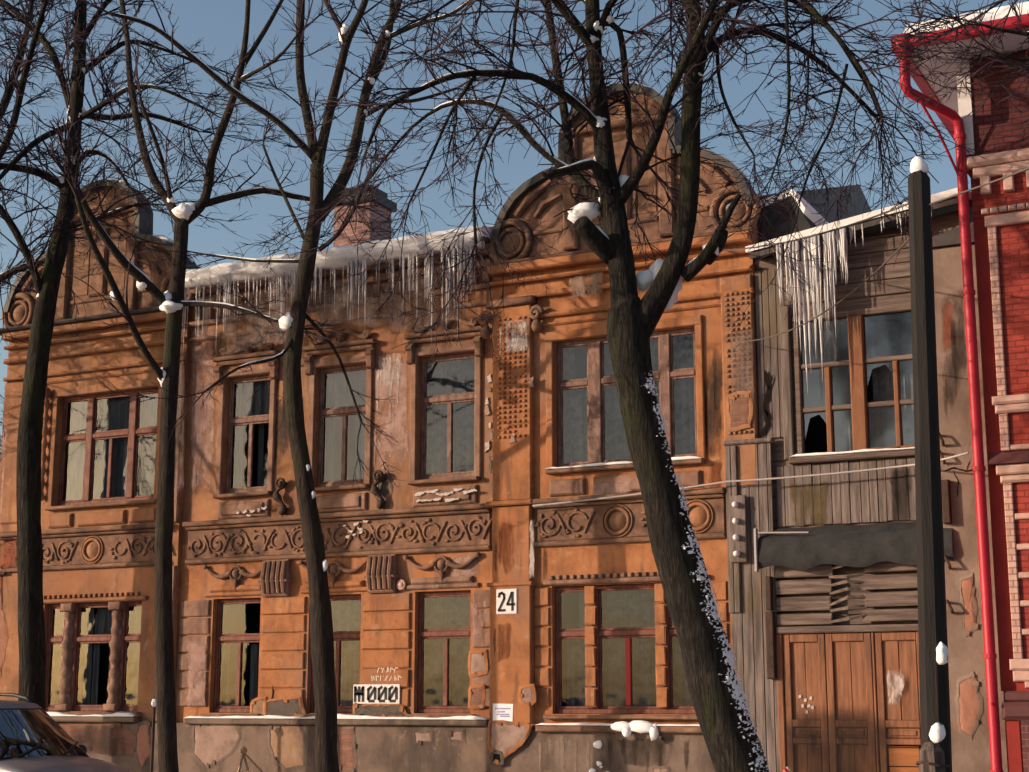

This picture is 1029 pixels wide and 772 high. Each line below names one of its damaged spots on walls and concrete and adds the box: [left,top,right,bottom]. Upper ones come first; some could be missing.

water stain [942,295,965,403]
water stain [704,334,753,454]
peeling [959,573,978,637]
peeling [191,718,242,769]
peeling [250,696,306,772]
peeling [954,671,983,740]